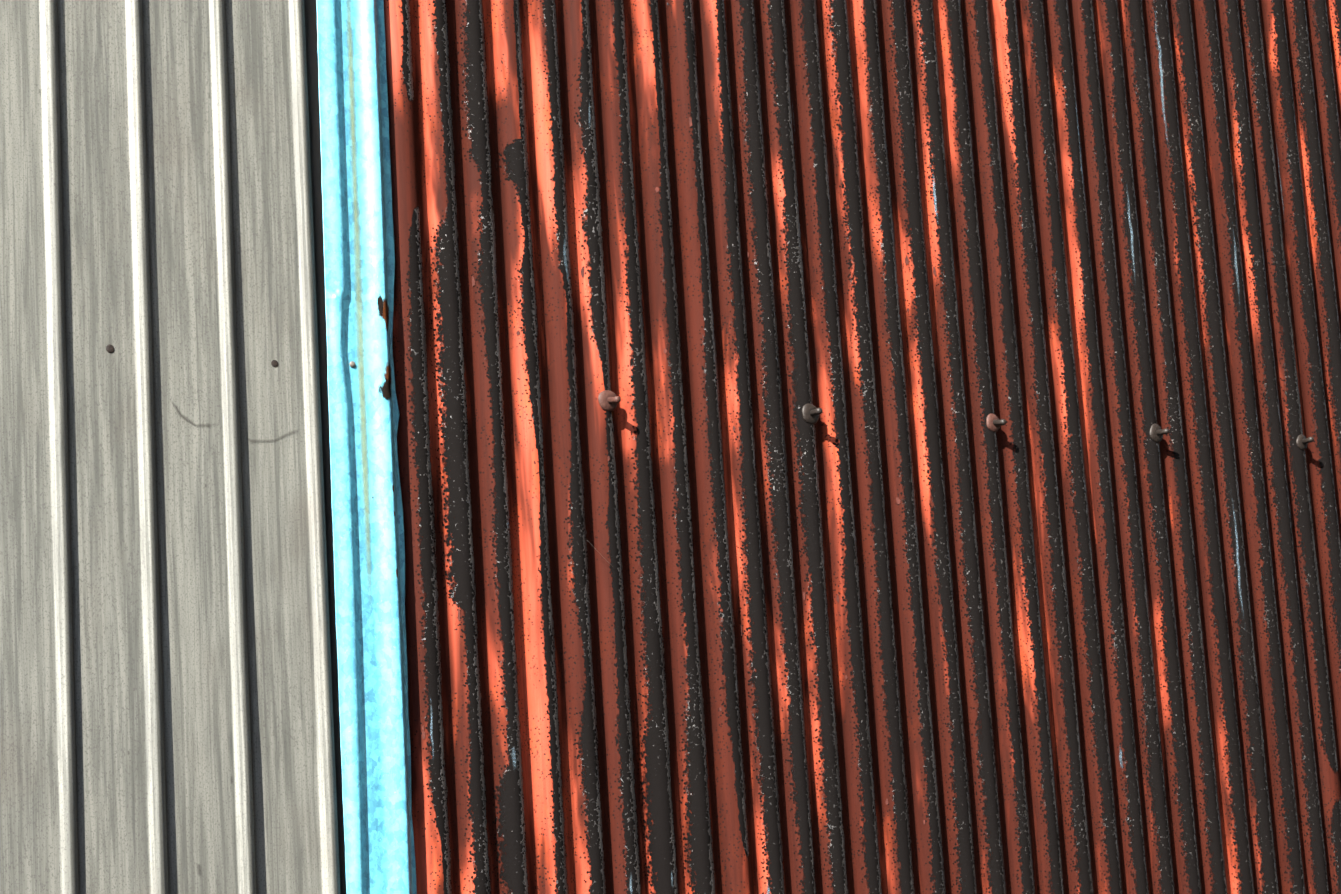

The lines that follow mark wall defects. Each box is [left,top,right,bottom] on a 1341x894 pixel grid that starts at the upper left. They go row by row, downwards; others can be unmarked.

rust [377,294,389,331]